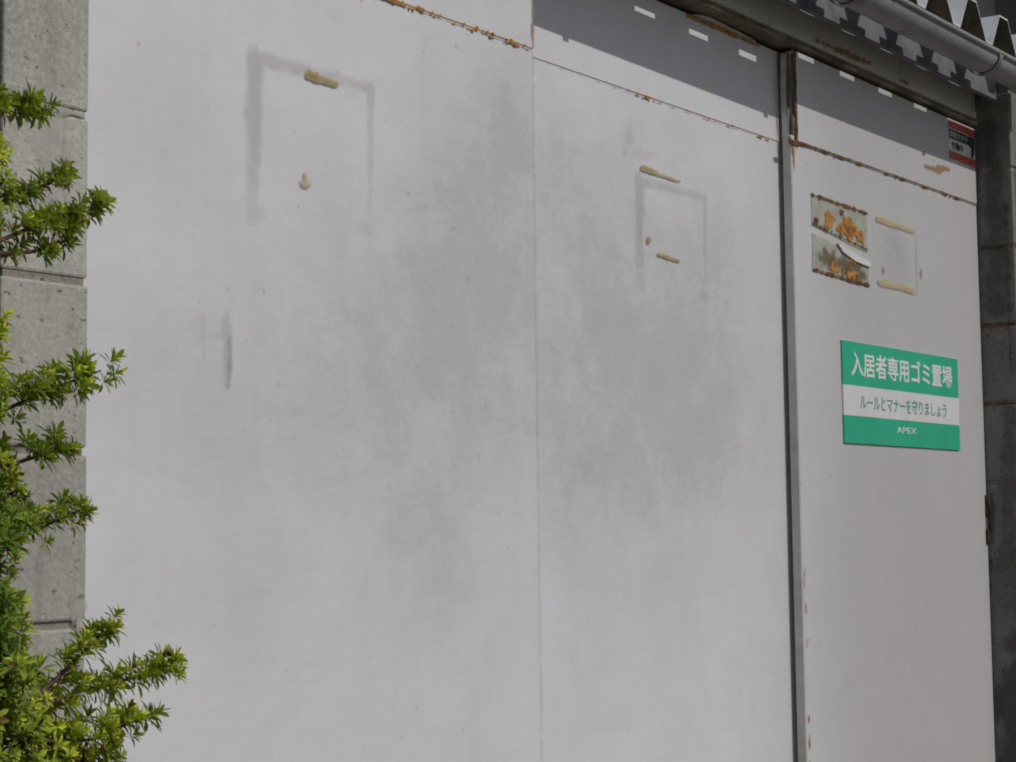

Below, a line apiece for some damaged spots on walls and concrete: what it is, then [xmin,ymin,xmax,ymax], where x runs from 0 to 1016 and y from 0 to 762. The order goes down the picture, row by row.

rust [389,0,541,60]
rust [615,85,770,140]
rust [788,51,977,205]